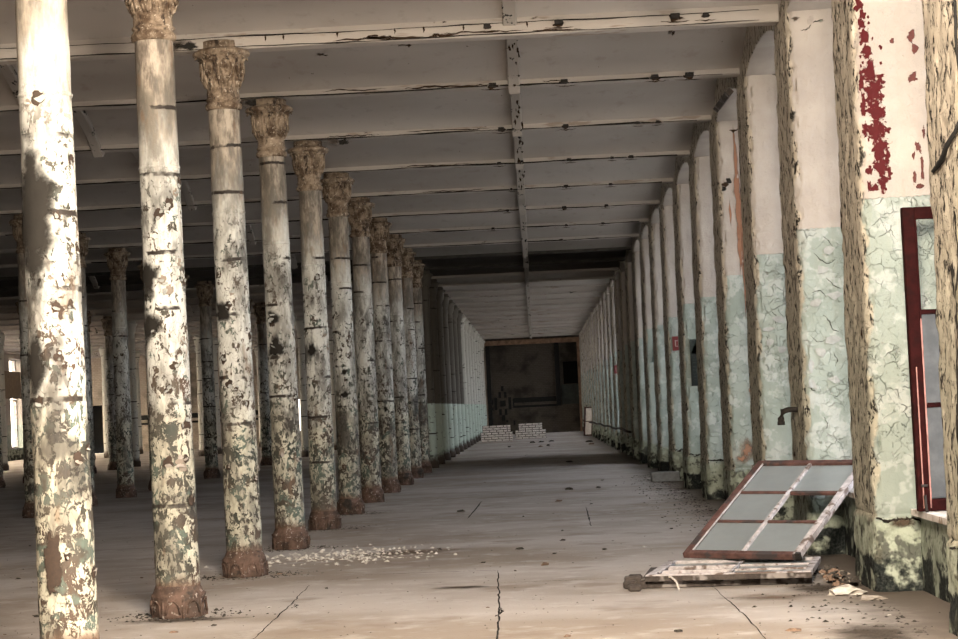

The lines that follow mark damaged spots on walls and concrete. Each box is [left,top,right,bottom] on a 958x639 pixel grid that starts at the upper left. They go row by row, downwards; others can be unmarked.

peeling [24,90,45,107]
peeling [843,0,893,194]
peeling [153,177,181,220]
peeling [157,258,187,295]
peeling [51,298,74,320]
peeling [53,350,70,369]
peeling [73,443,90,466]
peeling [163,454,189,472]
crack [485,570,506,639]
crack [712,586,766,639]